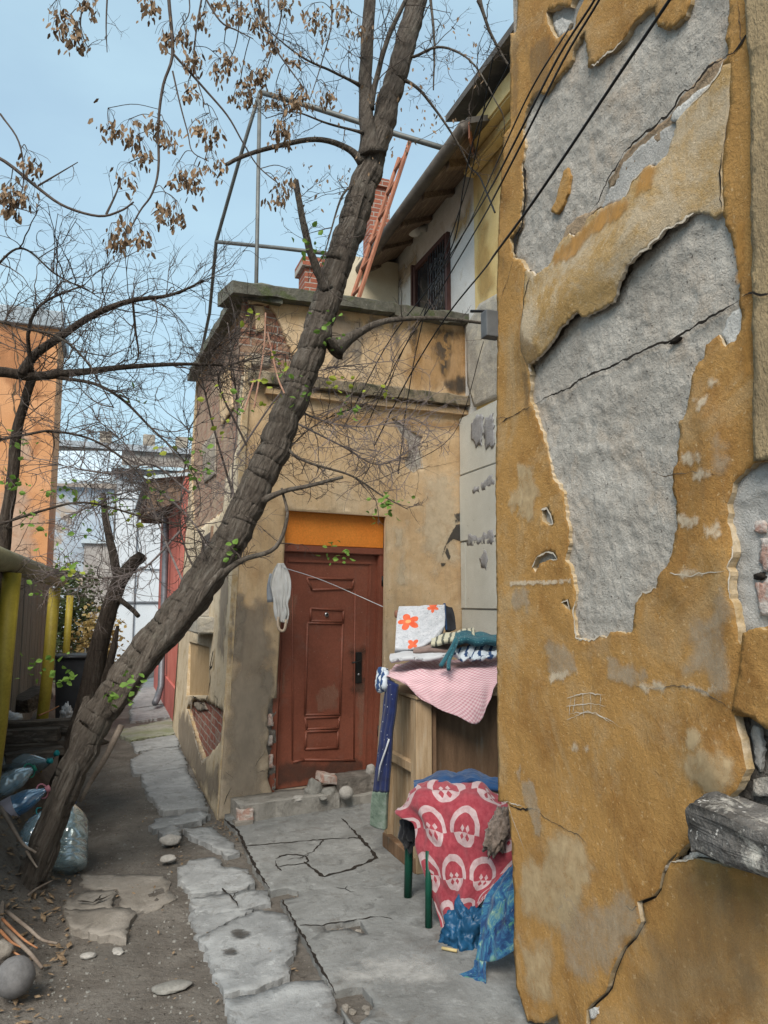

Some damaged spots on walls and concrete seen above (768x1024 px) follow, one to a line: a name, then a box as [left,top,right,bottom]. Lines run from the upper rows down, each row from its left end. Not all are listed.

spalling [513,0,729,274]
crack [719,120,728,207]
damp [436,330,466,393]
spalling [508,213,742,642]
spalling [727,462,768,632]
spalling [187,700,224,763]
spalling [738,717,768,806]
crack [505,801,585,843]
spalling [682,848,722,863]
crack [589,856,694,1019]